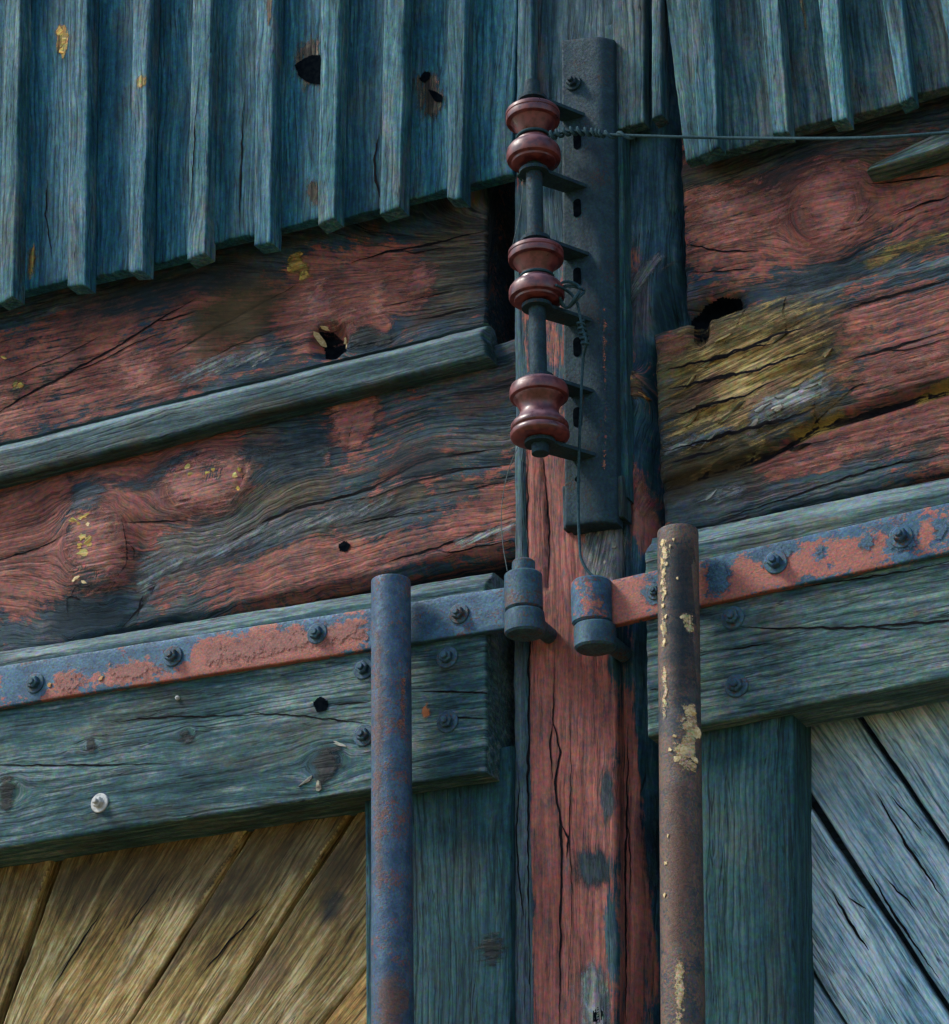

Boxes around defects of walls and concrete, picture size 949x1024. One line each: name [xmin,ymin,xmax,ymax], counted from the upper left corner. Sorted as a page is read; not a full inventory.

peeling [330,395,382,449]
crack [661,296,949,493]
peeling [67,449,224,516]
crack [109,701,371,724]
peeling [668,704,701,772]
crack [515,641,573,1024]
crack [875,792,948,904]
crack [832,871,941,981]